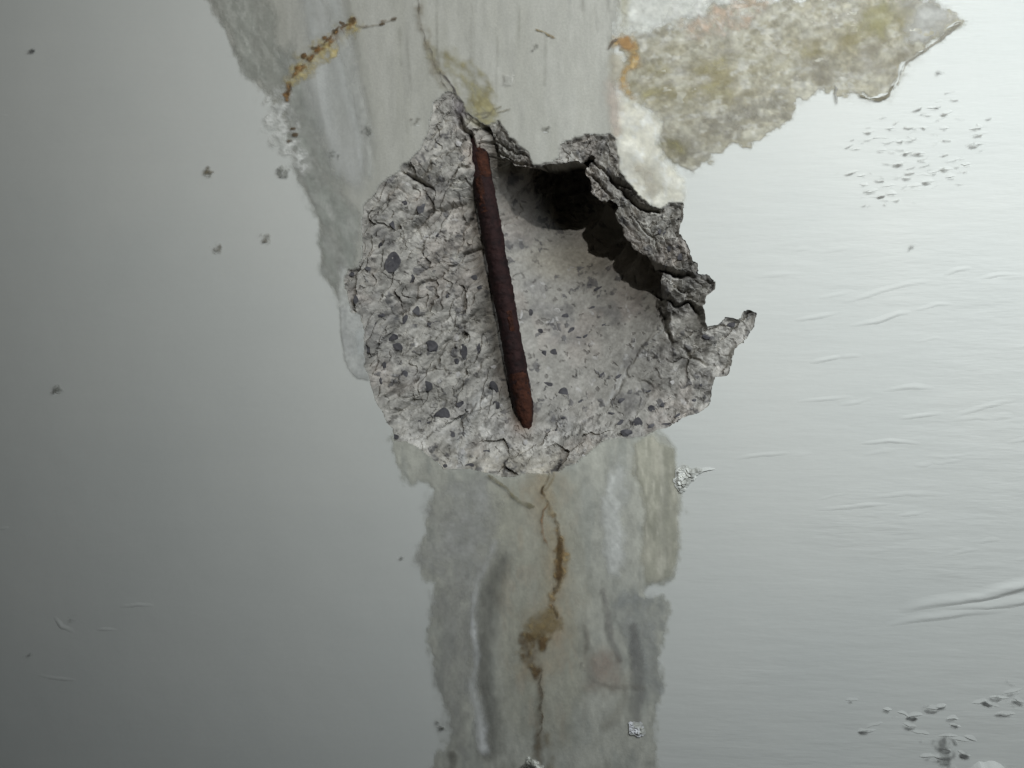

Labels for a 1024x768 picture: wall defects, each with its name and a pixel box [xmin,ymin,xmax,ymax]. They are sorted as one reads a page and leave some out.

rust [283,17,363,101]
peeling [620,0,964,171]
spalling [344,91,757,477]
crack [488,475,563,618]
damp [392,431,681,768]
rust [521,529,569,678]